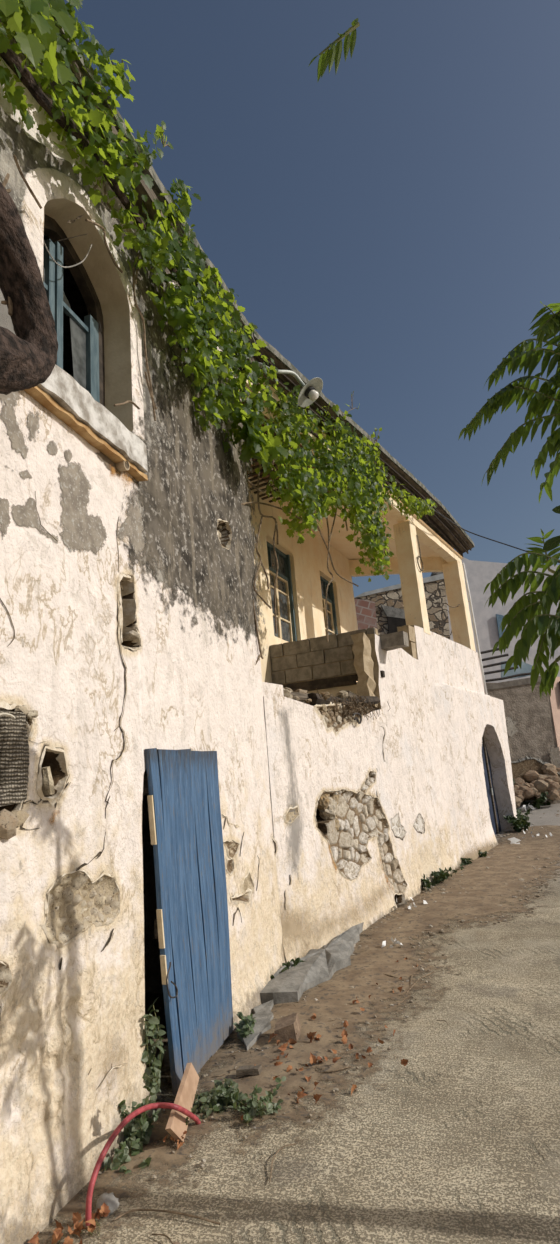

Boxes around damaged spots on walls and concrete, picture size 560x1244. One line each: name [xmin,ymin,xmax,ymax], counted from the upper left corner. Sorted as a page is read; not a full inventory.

peeling [0,391,147,556]
spalling [217,519,232,550]
spalling [118,573,142,651]
crack [97,517,127,858]
spalling [0,699,38,744]
spalling [37,746,69,807]
spalling [0,802,29,840]
spalling [283,806,299,824]
spalling [315,770,425,908]
spalling [40,869,120,948]
spalling [0,960,12,1021]